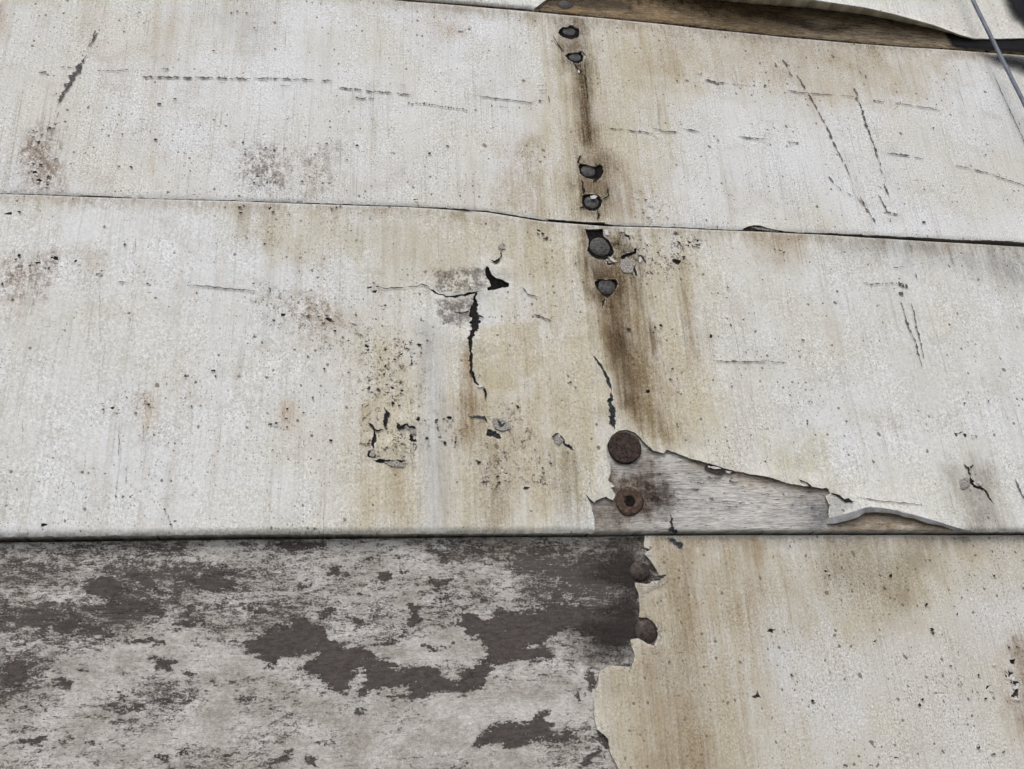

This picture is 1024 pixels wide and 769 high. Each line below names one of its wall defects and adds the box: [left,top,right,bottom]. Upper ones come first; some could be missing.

crack [380,243,511,439]
crack [594,357,616,429]
crack [959,464,991,501]
peeling [346,556,409,596]
peeling [82,571,216,633]
peeling [52,613,198,678]
peeling [228,576,664,715]
peeling [51,664,89,691]
peeling [12,729,95,748]
peeling [258,748,318,768]
peeling [472,709,582,754]
peeling [581,730,609,769]